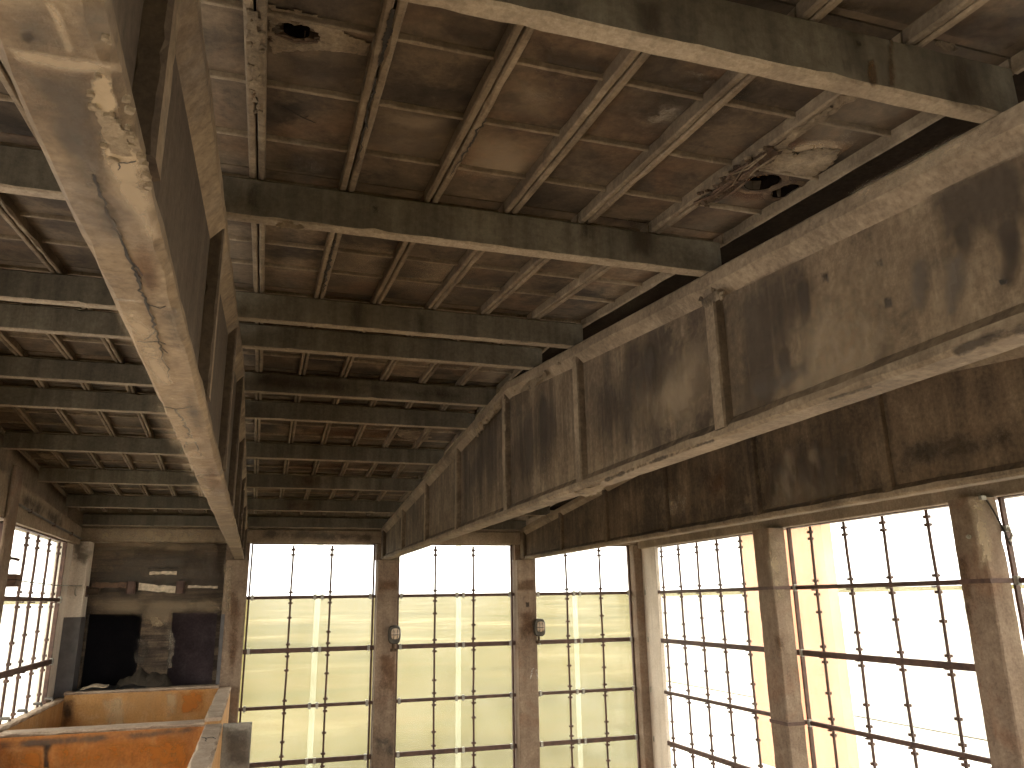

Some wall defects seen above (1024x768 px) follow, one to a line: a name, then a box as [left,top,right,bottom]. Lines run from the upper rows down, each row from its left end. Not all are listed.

spalling [267,4,371,56]
peeling [86,71,153,192]
spalling [693,95,858,208]
crack [92,161,172,382]